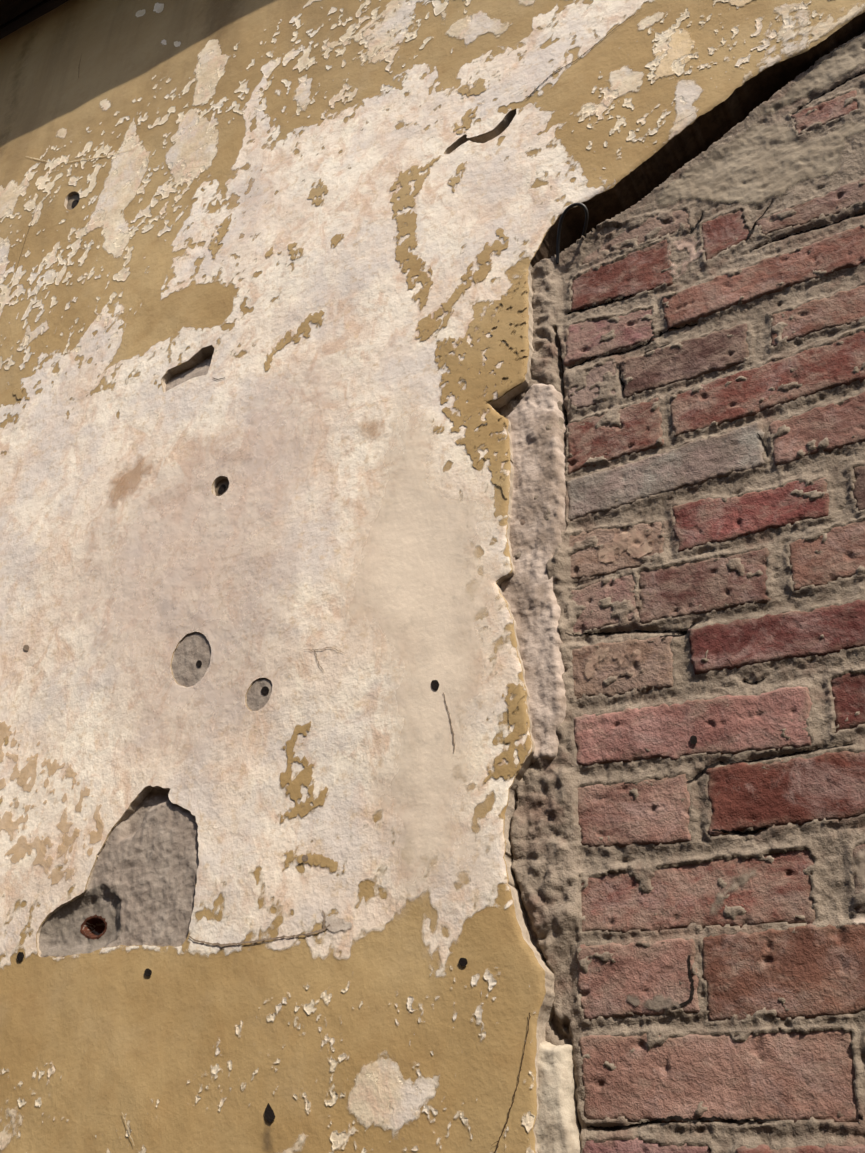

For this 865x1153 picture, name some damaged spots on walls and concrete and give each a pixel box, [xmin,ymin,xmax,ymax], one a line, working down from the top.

peeling [571,0,865,158]
peeling [0,0,653,988]
peeling [0,1062,69,1150]
peeling [187,1039,284,1112]
peeling [259,981,477,1153]
peeling [466,967,498,1040]
crack [491,1013,531,1153]
peeling [522,1111,535,1133]